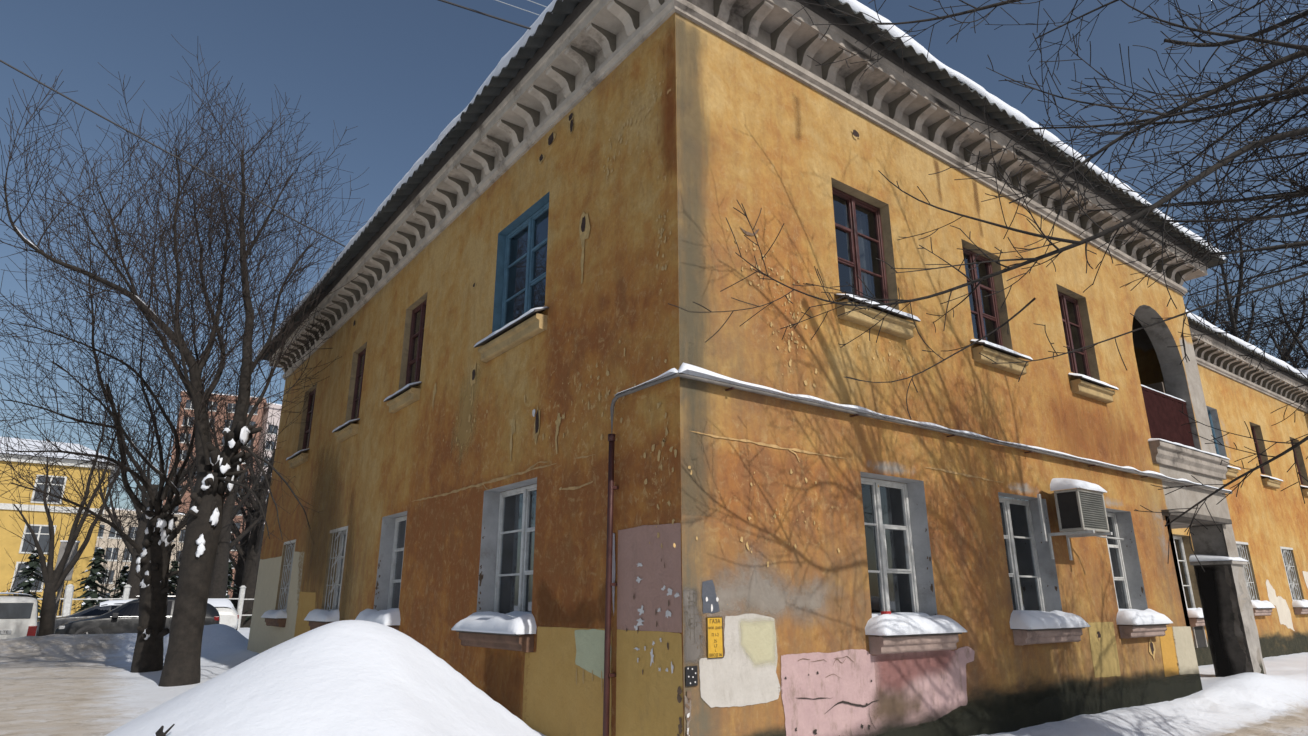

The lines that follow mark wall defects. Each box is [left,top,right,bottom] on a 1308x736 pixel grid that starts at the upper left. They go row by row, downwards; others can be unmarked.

peeling [524,364,692,548]
leakage [709,568,824,615]
peeling [1266,579,1295,631]
leakage [873,652,951,721]
crack [799,697,879,729]